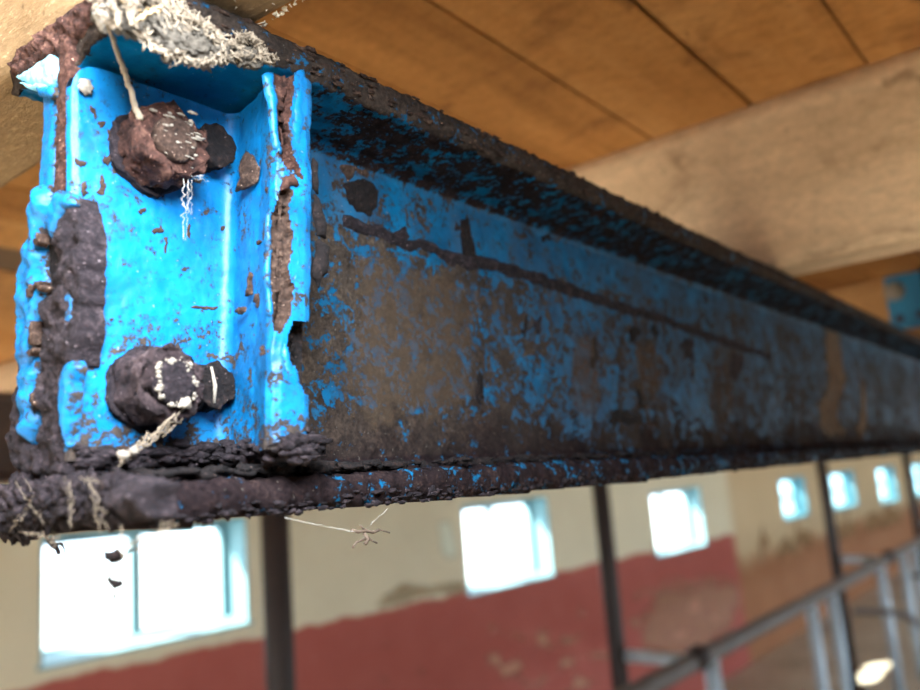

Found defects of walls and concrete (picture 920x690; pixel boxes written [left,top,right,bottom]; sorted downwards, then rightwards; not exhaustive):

corrosion [7,0,96,100]
corrosion [90,105,110,142]
corrosion [81,155,111,197]
spalling [339,165,379,217]
spalling [263,187,300,334]
peeling [5,190,107,477]
corrosion [72,427,333,476]